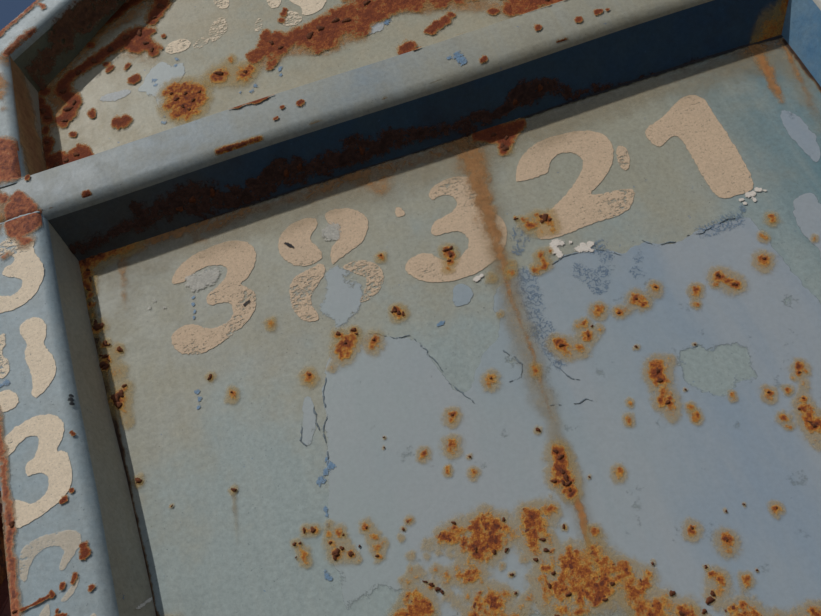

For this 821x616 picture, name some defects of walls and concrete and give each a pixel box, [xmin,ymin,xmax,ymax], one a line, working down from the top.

rust [69,0,821,276]
rust [0,190,42,247]
rust [711,269,743,291]
rust [330,326,380,370]
rust [552,282,660,357]
peeling [299,187,821,616]
rust [647,357,677,418]
rust [784,360,821,441]
rust [0,416,21,616]
rust [292,523,361,564]
rust [393,438,764,616]
rust [49,572,78,599]